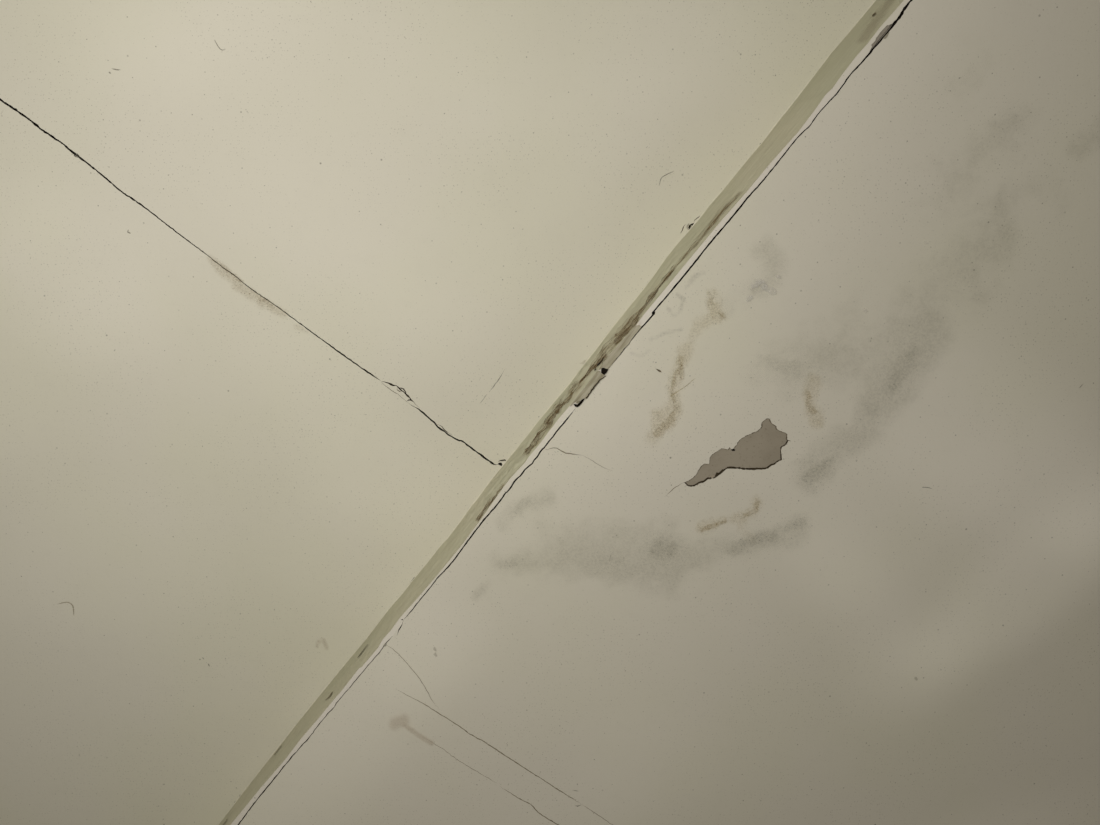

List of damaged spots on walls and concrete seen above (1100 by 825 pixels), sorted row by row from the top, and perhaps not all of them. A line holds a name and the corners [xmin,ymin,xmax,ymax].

water stain [526,309,642,451]
crack [0,98,613,825]
peeling [668,418,790,494]